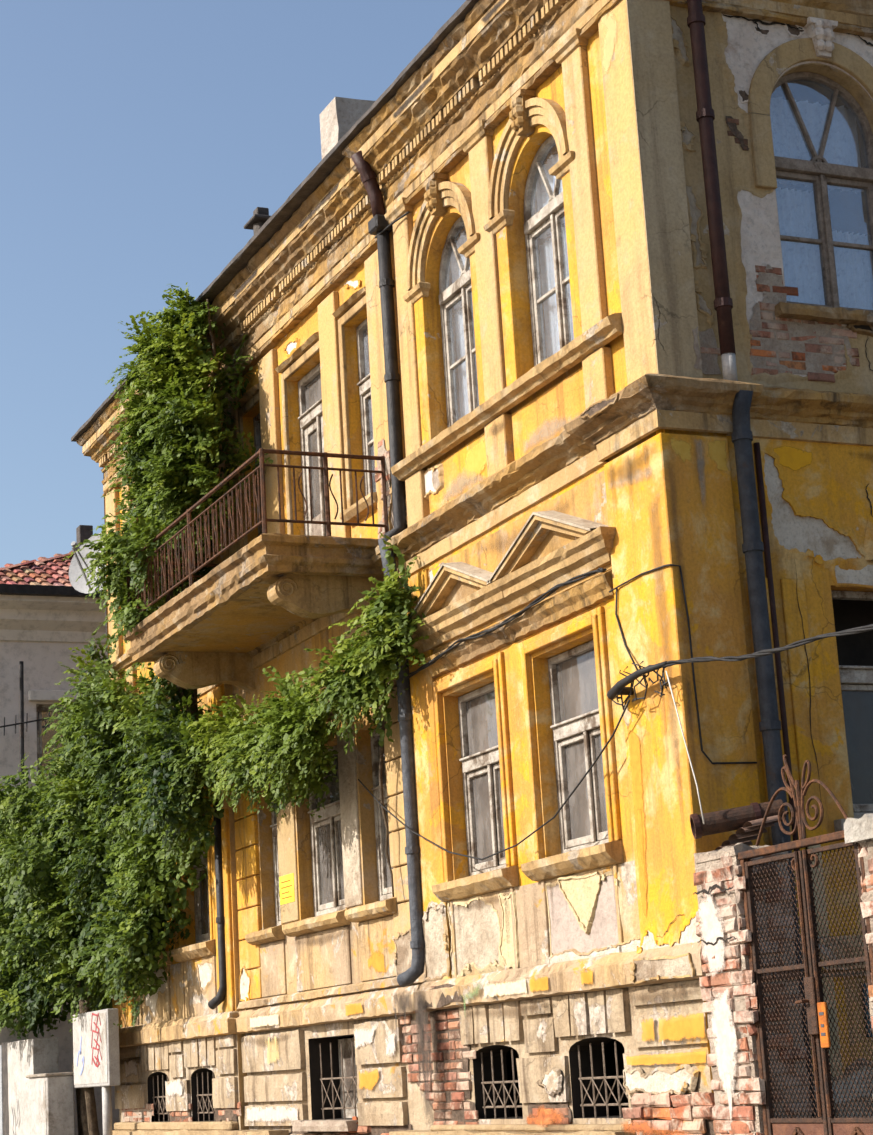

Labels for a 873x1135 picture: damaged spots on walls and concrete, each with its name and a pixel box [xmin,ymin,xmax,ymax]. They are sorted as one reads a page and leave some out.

peeling [713,12,809,151]
peeling [832,32,873,67]
flaking render [732,185,860,385]
peeling [760,446,870,570]
peeling [546,871,725,984]
flaking render [121,1102,154,1122]
flaking render [165,1079,193,1122]
peeling [354,895,504,1125]
flaking render [622,989,751,1135]